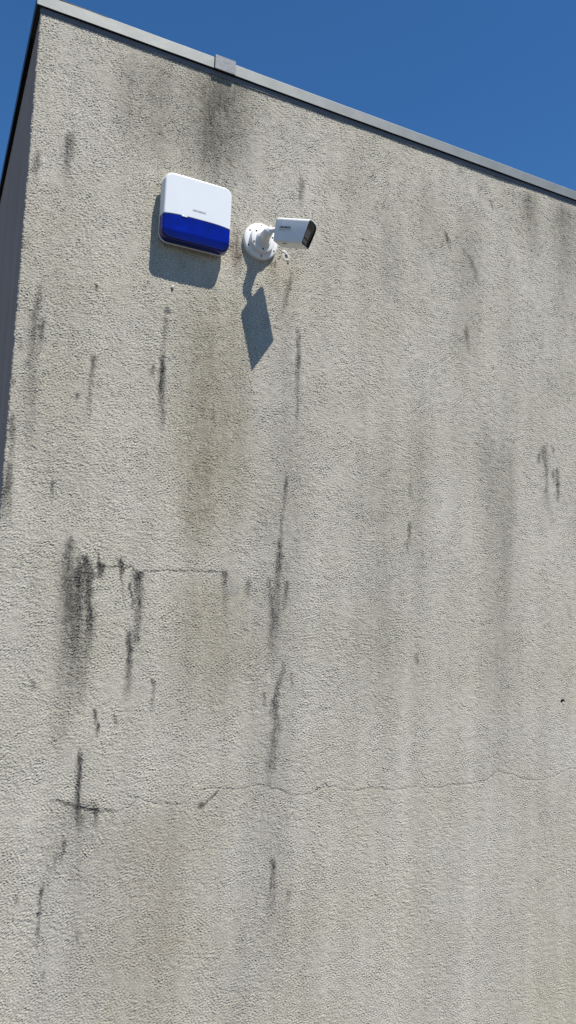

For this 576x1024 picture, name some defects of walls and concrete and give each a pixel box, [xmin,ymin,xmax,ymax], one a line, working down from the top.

damp [64,545,105,633]